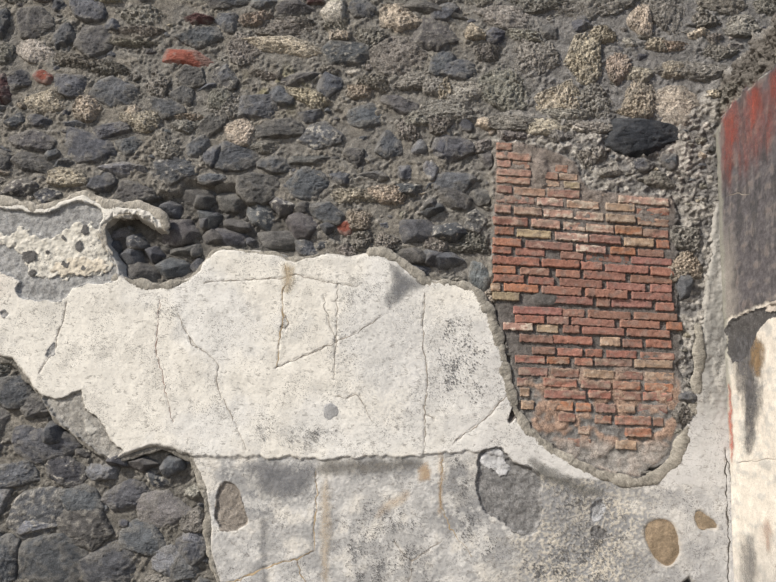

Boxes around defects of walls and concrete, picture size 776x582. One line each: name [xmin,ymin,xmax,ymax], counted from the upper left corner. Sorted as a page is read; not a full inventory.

spalling [0,200,120,303]
spalling [113,208,154,224]
spalling [42,389,125,459]
crack [179,318,245,446]
crack [204,265,379,378]
crack [421,293,434,453]
crack [454,395,507,443]
water stain [732,335,761,452]
spalling [724,300,776,363]
spalling [214,482,248,532]
crack [396,459,472,582]
crack [724,449,772,582]